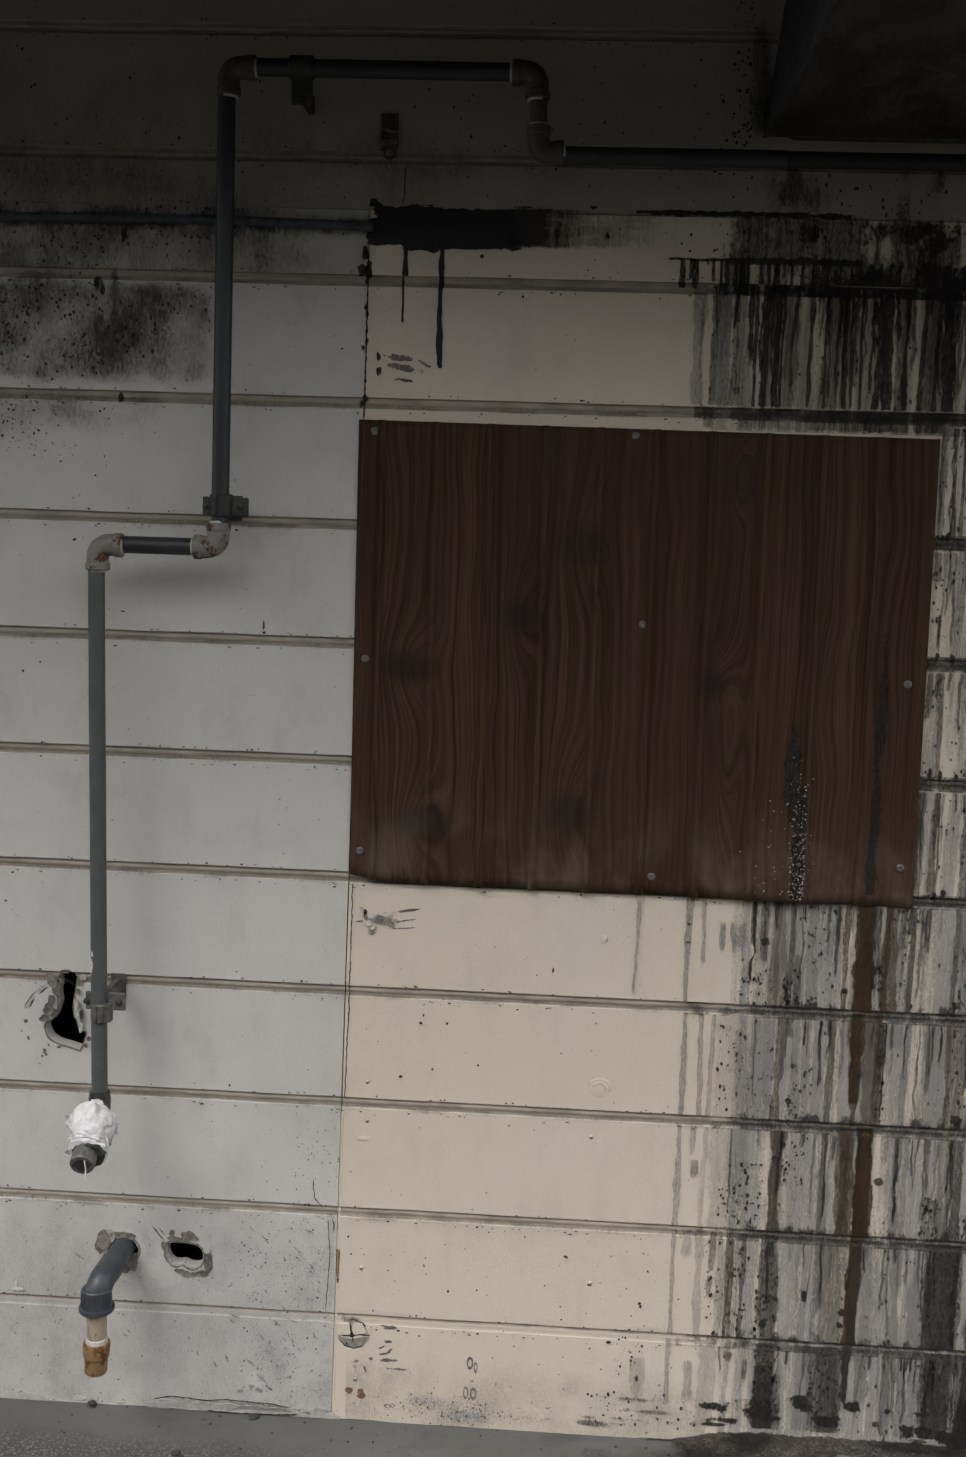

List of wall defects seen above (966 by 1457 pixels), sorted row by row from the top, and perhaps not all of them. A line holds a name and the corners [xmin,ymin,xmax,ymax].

mould [0,140,216,476]
damp [568,168,966,1449]
hole [21,970,91,1057]
hole [95,1229,141,1273]
hole [153,1227,213,1277]
damp [368,1357,564,1427]